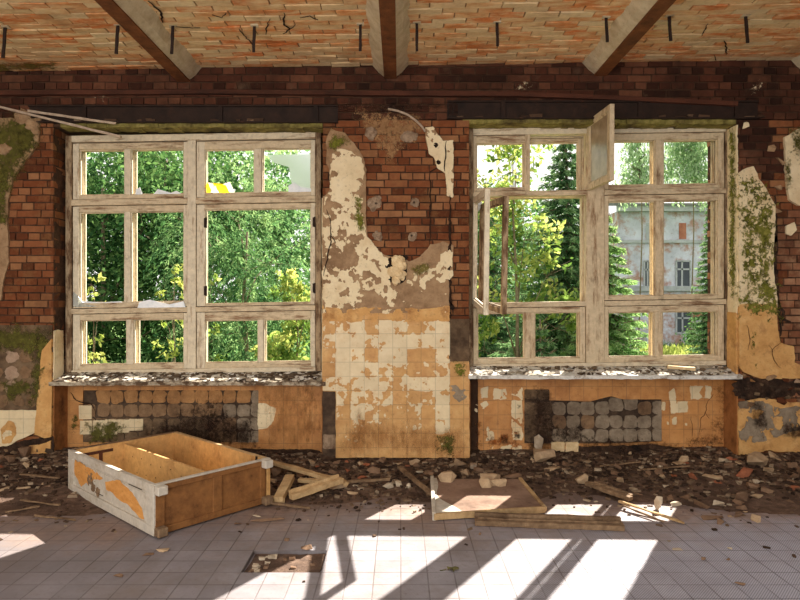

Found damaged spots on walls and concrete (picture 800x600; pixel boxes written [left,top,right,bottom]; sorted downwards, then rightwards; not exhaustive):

crack [148,1,226,28]
crack [239,13,318,44]
spalling [737,120,785,191]
spalling [0,143,54,323]
spalling [83,120,470,461]
spalling [775,207,800,365]
peeling [0,350,37,408]
spalling [0,421,55,454]
peeling [474,385,712,453]
spalling [731,374,800,443]